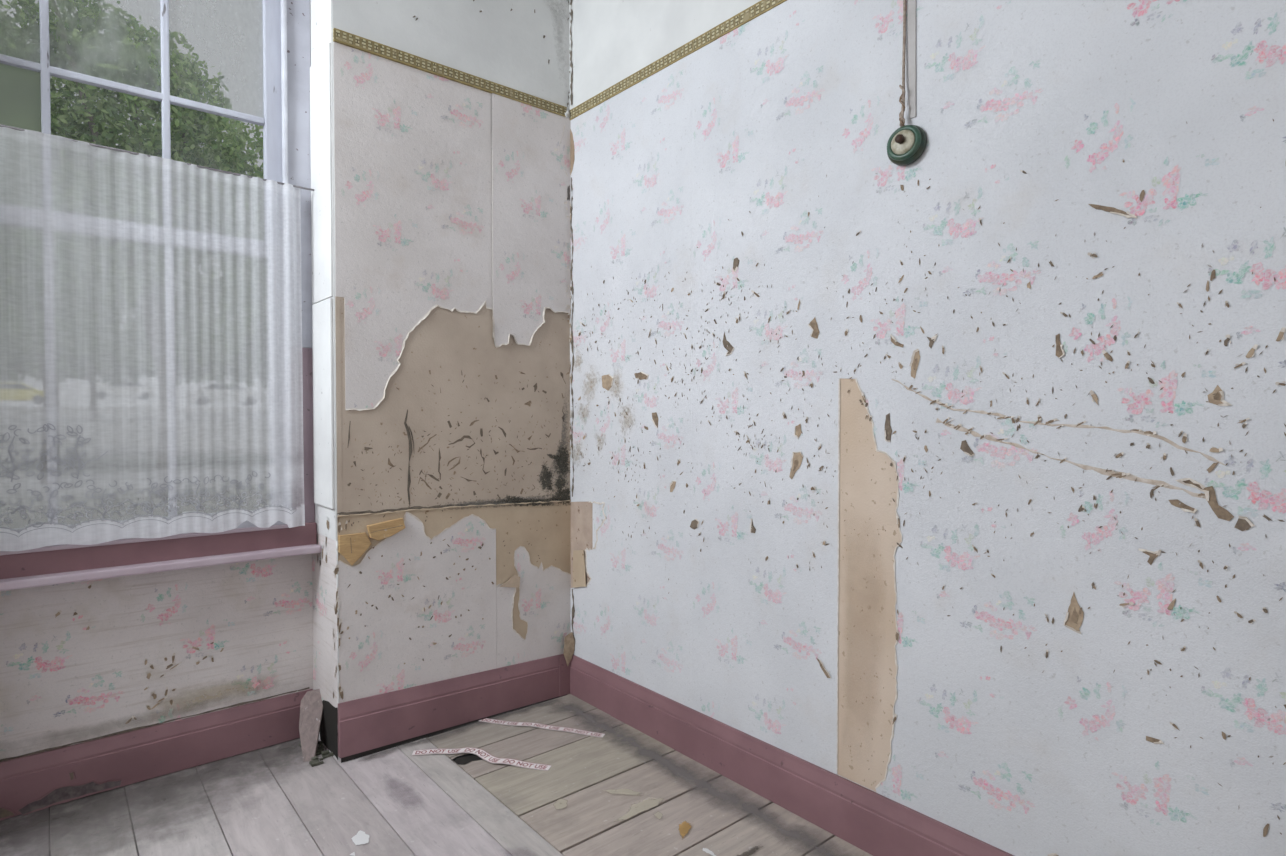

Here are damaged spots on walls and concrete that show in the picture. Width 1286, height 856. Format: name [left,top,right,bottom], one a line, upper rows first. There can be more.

spalling [1177,243,1286,393]
spalling [990,325,1163,462]
mould [498,414,571,506]
flaking render [317,221,975,792]
spalling [1046,470,1143,539]
spalling [1106,430,1174,493]
spalling [1168,412,1250,475]